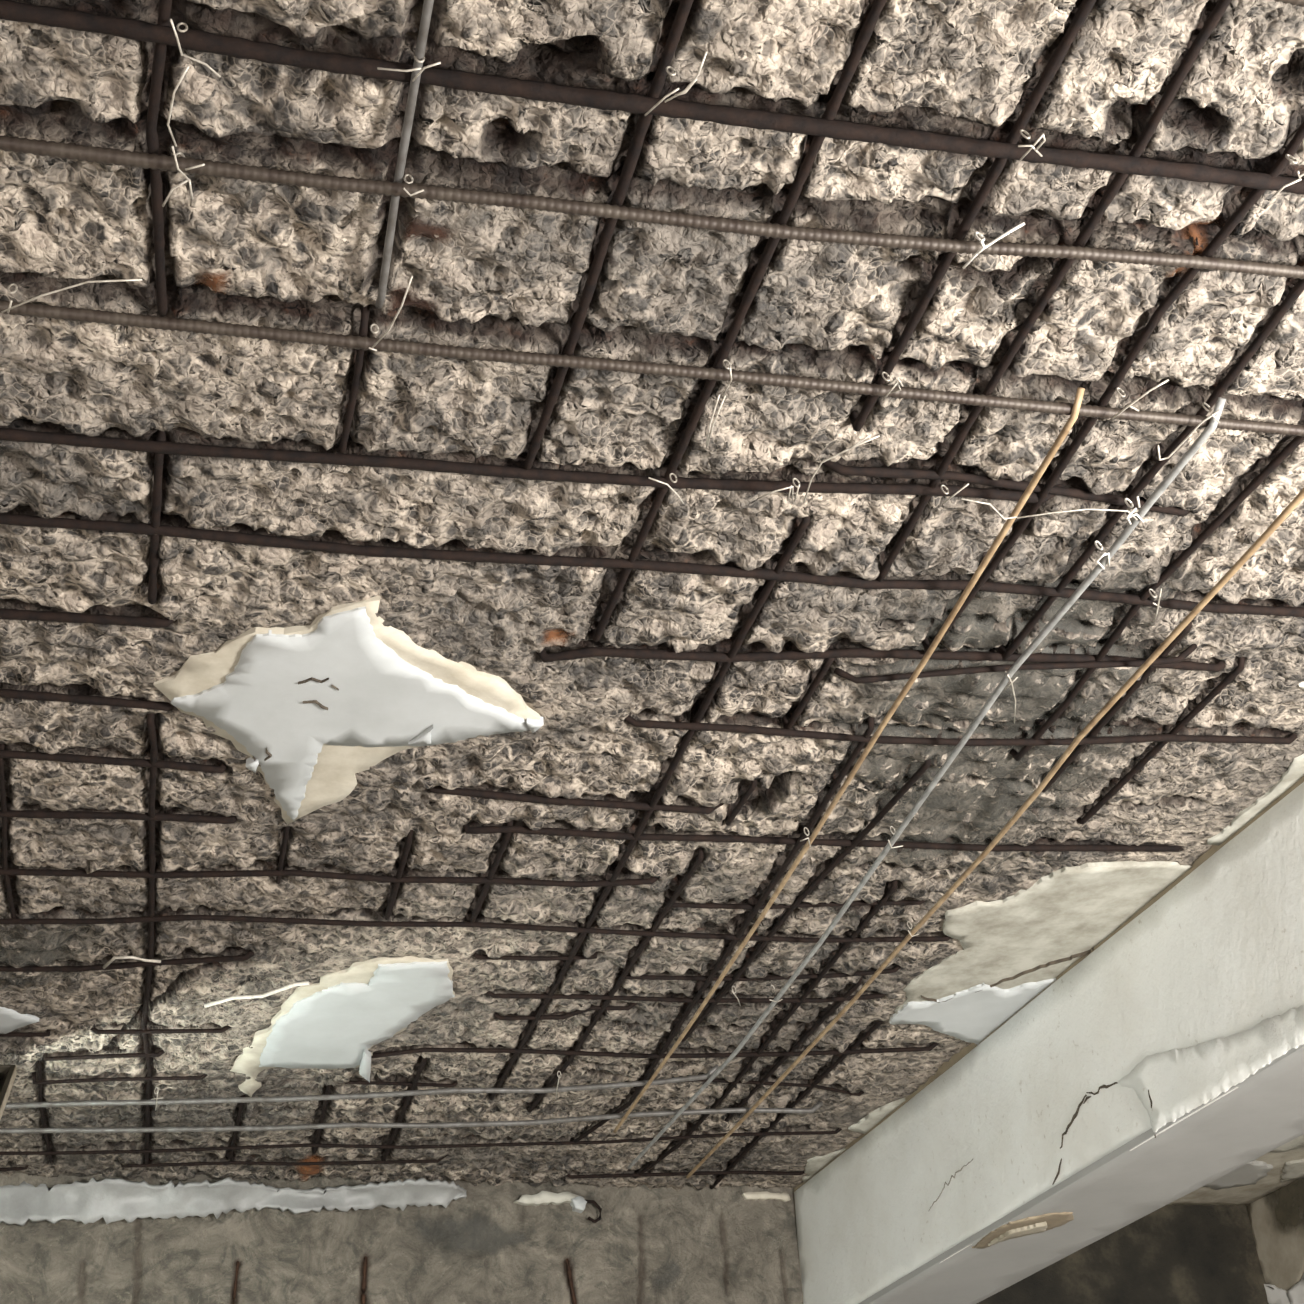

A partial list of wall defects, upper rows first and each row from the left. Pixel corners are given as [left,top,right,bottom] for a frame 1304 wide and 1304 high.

spalling [0,0,1304,939]
spalling [0,499,1304,1304]
crack [1052,1082,1118,1185]